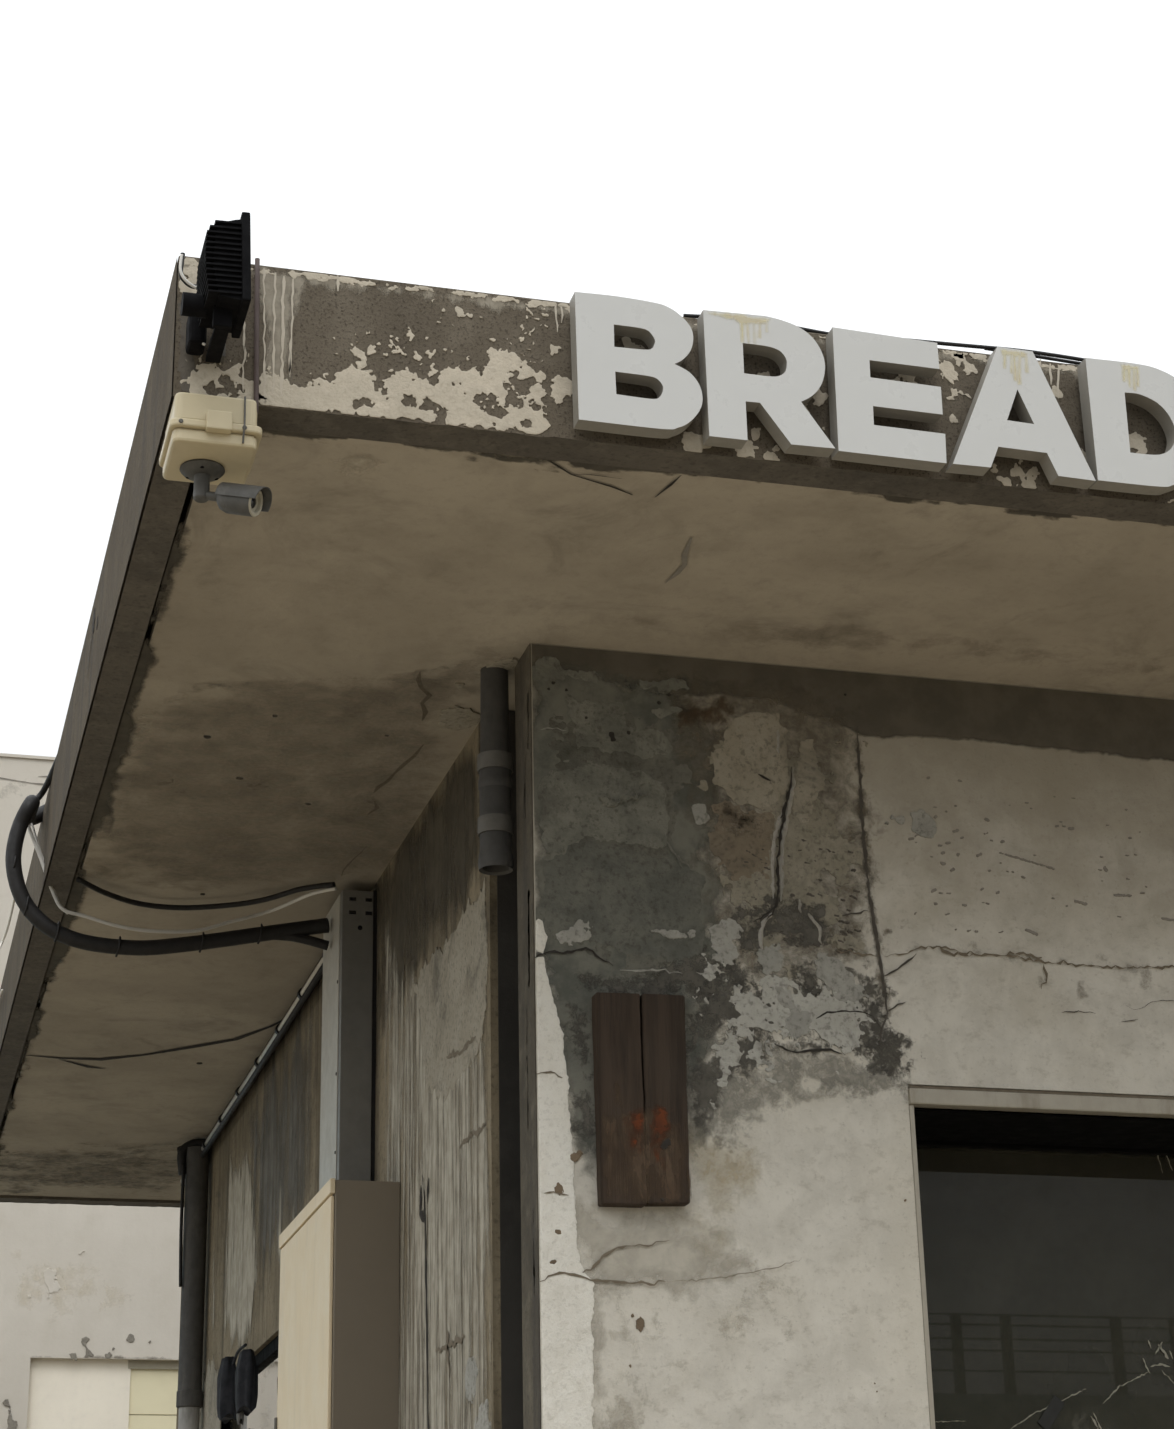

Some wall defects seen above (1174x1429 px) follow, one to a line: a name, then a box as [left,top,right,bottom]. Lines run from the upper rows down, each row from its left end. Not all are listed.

peeling [179,257,199,293]
leakage [254,266,366,398]
peeling [180,268,572,435]
leakage [450,294,570,332]
peeling [681,432,712,453]
peeling [735,427,780,461]
leakage [16,523,384,1078]
peeling [535,656,876,1109]
crack [753,726,1174,1054]
leakage [345,747,489,1429]
leakage [211,1025,309,1351]
crack [540,1240,794,1286]